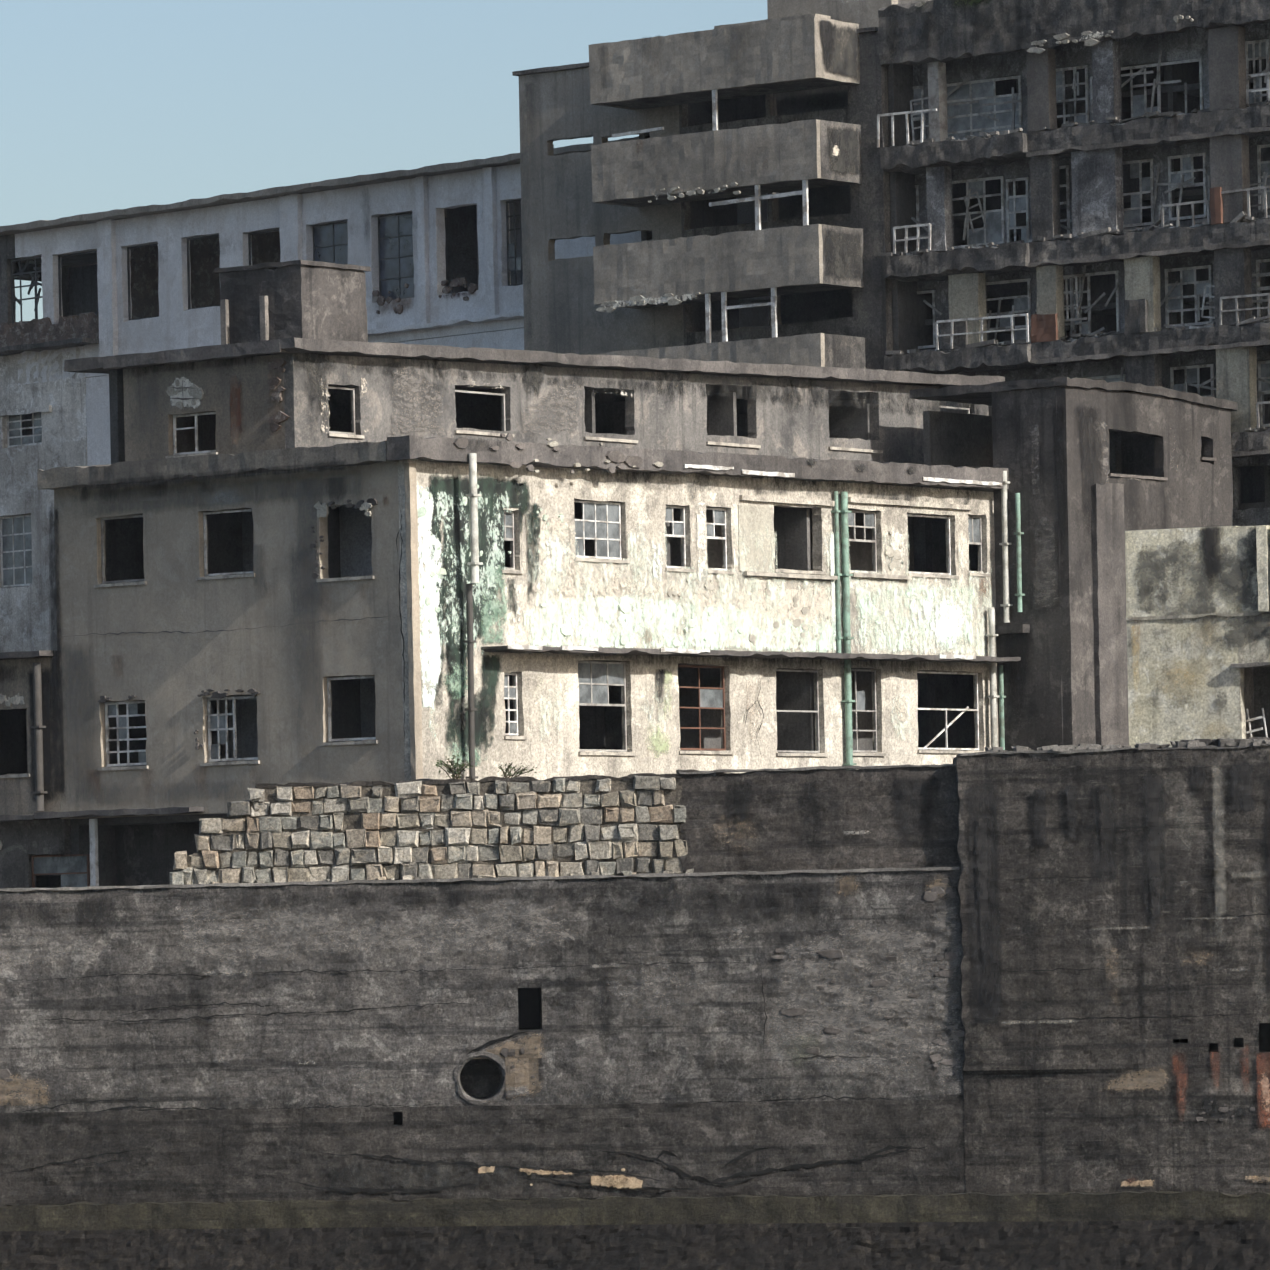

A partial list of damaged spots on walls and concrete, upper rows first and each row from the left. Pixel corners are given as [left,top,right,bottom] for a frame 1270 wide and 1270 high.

spalling [1027,30,1114,54]
rust [438,277,478,301]
spalling [596,292,701,313]
water stain [427,486,467,731]
water stain [509,503,541,610]
peeling [514,501,992,656]
water stain [1135,526,1270,648]
water stain [480,655,501,739]
rust [1174,1055,1187,1115]
rust [1242,1046,1270,1128]
crack [297,1145,927,1194]
spalling [591,1168,644,1189]